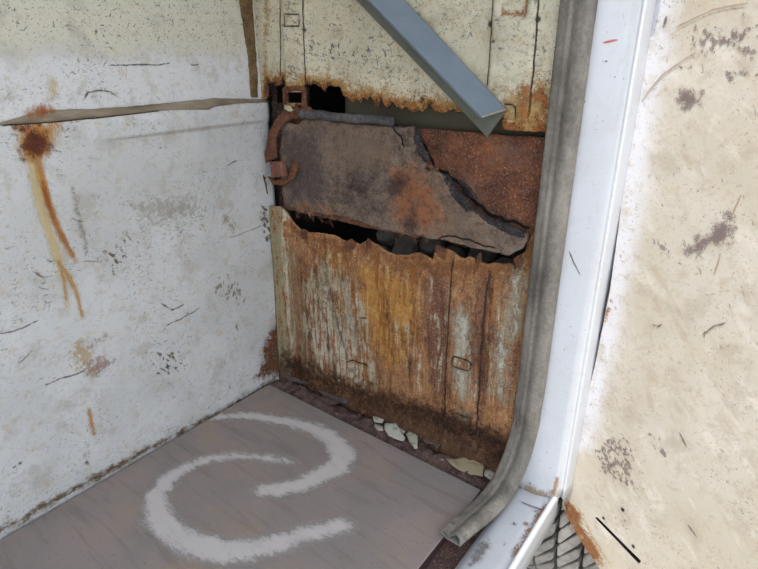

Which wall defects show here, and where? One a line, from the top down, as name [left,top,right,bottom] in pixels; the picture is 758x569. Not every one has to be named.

rust [262,52,462,113]
rust [503,74,550,132]
rust [13,105,83,316]
crack [392,127,530,248]
rust [0,221,534,532]
rust [564,500,605,567]